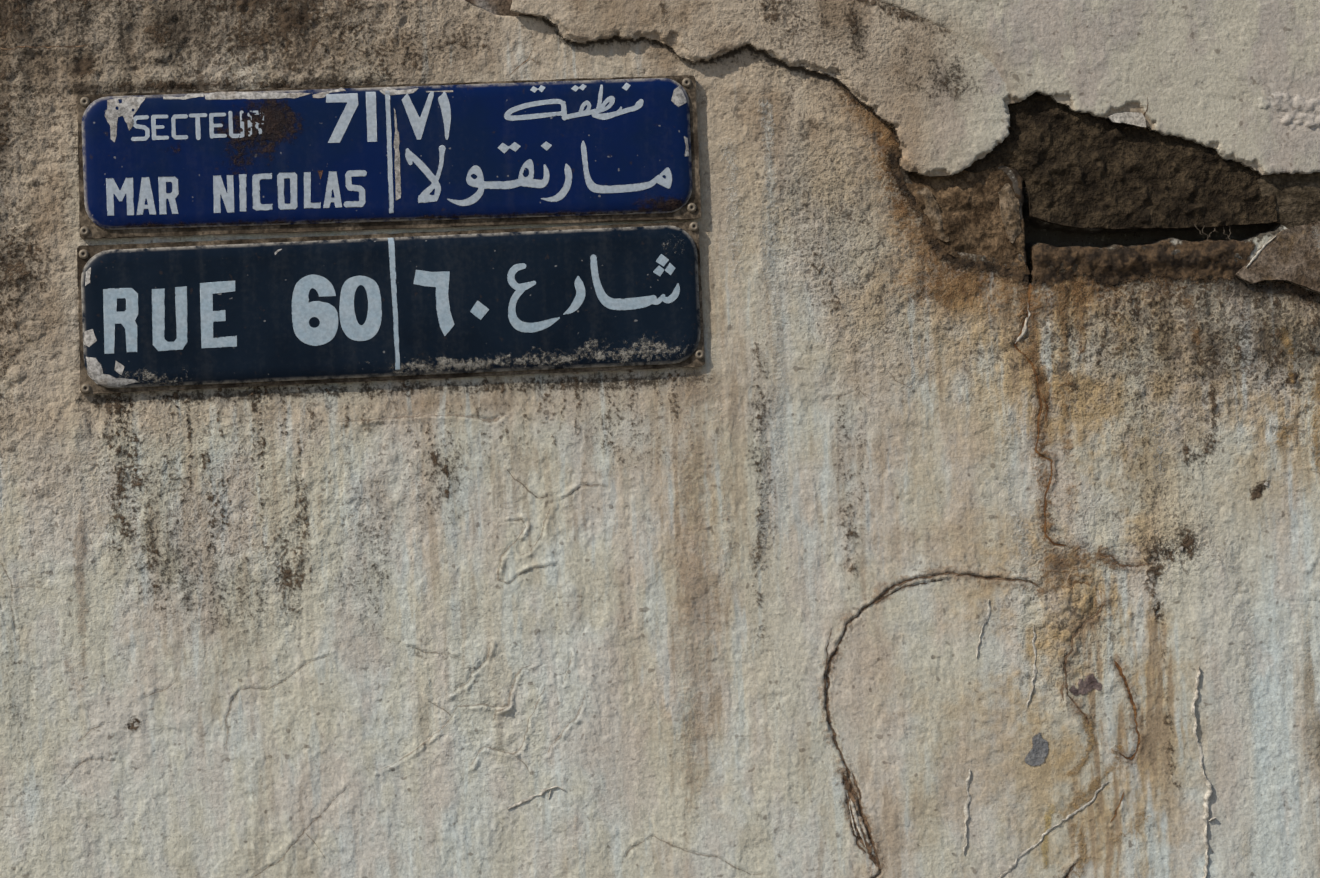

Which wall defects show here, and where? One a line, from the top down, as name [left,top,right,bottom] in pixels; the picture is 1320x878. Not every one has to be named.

damp [117,0,426,91]
spalling [885,92,1320,293]
damp [0,227,47,334]
damp [96,392,167,610]
damp [161,391,244,553]
damp [236,384,329,614]
damp [449,370,637,449]
damp [1050,281,1241,465]
damp [1140,524,1198,622]
damp [1245,281,1320,367]
crack [824,572,1042,878]
corrosion [1069,717,1096,774]